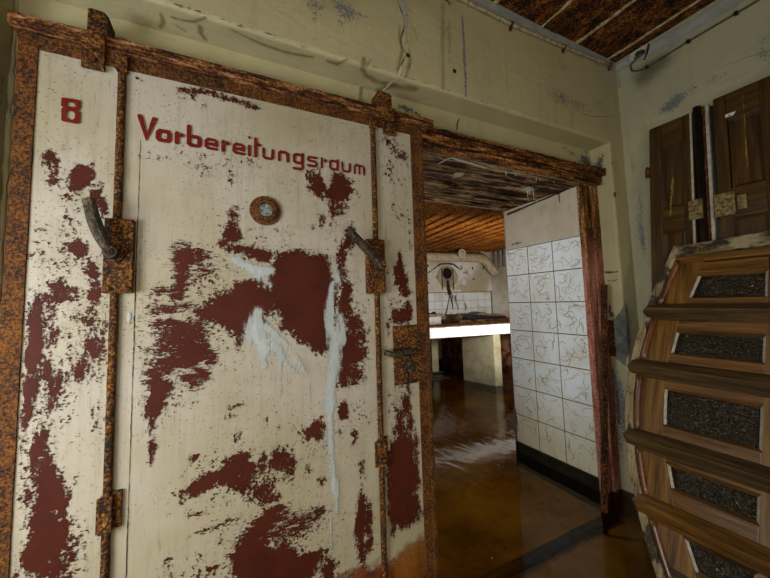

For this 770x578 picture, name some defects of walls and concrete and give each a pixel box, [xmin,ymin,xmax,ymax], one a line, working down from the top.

peeling [174,86,261,111]
peeling [186,153,269,195]
peeling [378,135,414,336]
peeling [10,142,109,578]
peeling [122,165,376,578]
peeling [385,379,424,539]
corrosion [336,538,426,578]